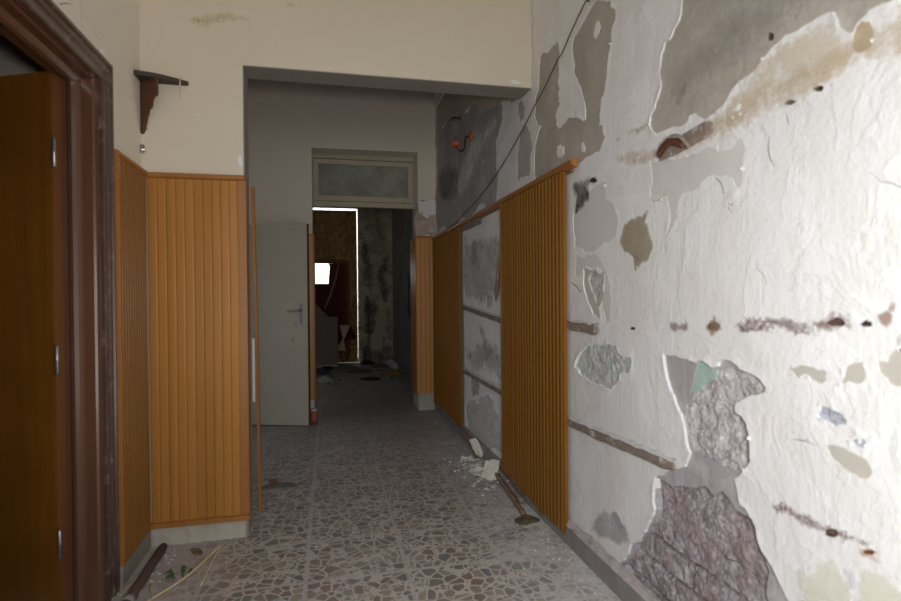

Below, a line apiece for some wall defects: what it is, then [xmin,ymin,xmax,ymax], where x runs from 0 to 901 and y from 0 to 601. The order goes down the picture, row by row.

peeling [414,1,615,236]
peeling [650,0,892,133]
peeling [573,183,618,324]
spalling [574,344,632,389]
spalling [622,355,788,601]